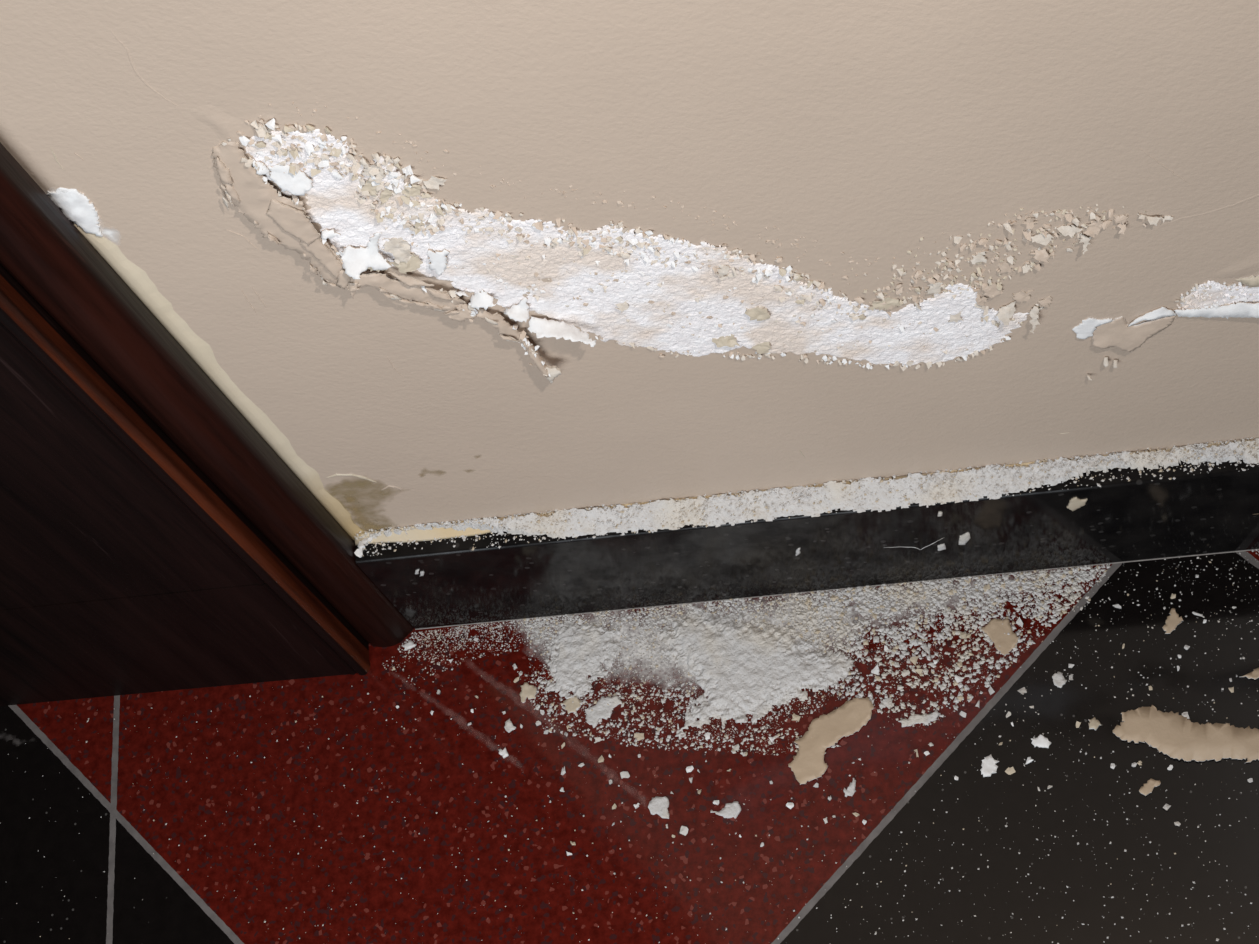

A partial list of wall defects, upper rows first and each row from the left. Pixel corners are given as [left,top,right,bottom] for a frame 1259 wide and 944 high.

peeling [47,187,117,241]
flaking render [212,102,1030,383]
peeling [1072,275,1259,368]
peeling [1067,497,1087,511]